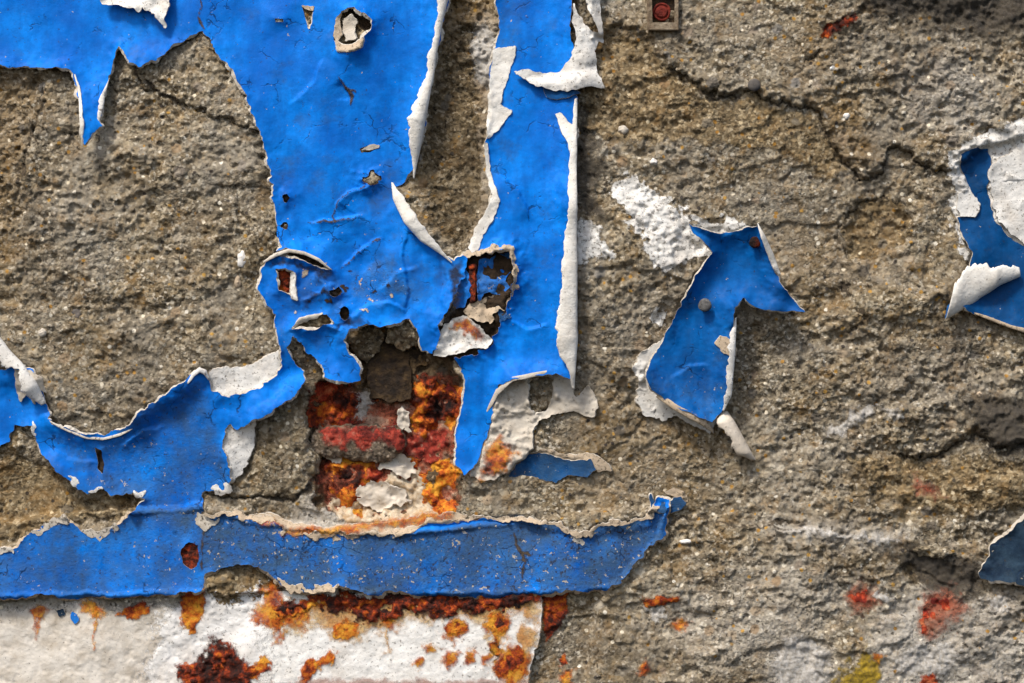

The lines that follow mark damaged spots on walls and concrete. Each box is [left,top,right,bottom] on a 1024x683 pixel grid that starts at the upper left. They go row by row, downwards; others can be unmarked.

corrosion [821,14,858,38]
crack [133,69,259,132]
crack [668,67,947,254]
peeling [945,117,1024,332]
peeling [0,0,848,624]
crack [840,283,871,333]
corrosion [264,372,463,537]
spalling [843,443,1024,587]
corrosion [179,589,206,635]
corrosion [175,635,272,683]
corrosion [251,580,569,683]
corrosion [559,653,572,683]